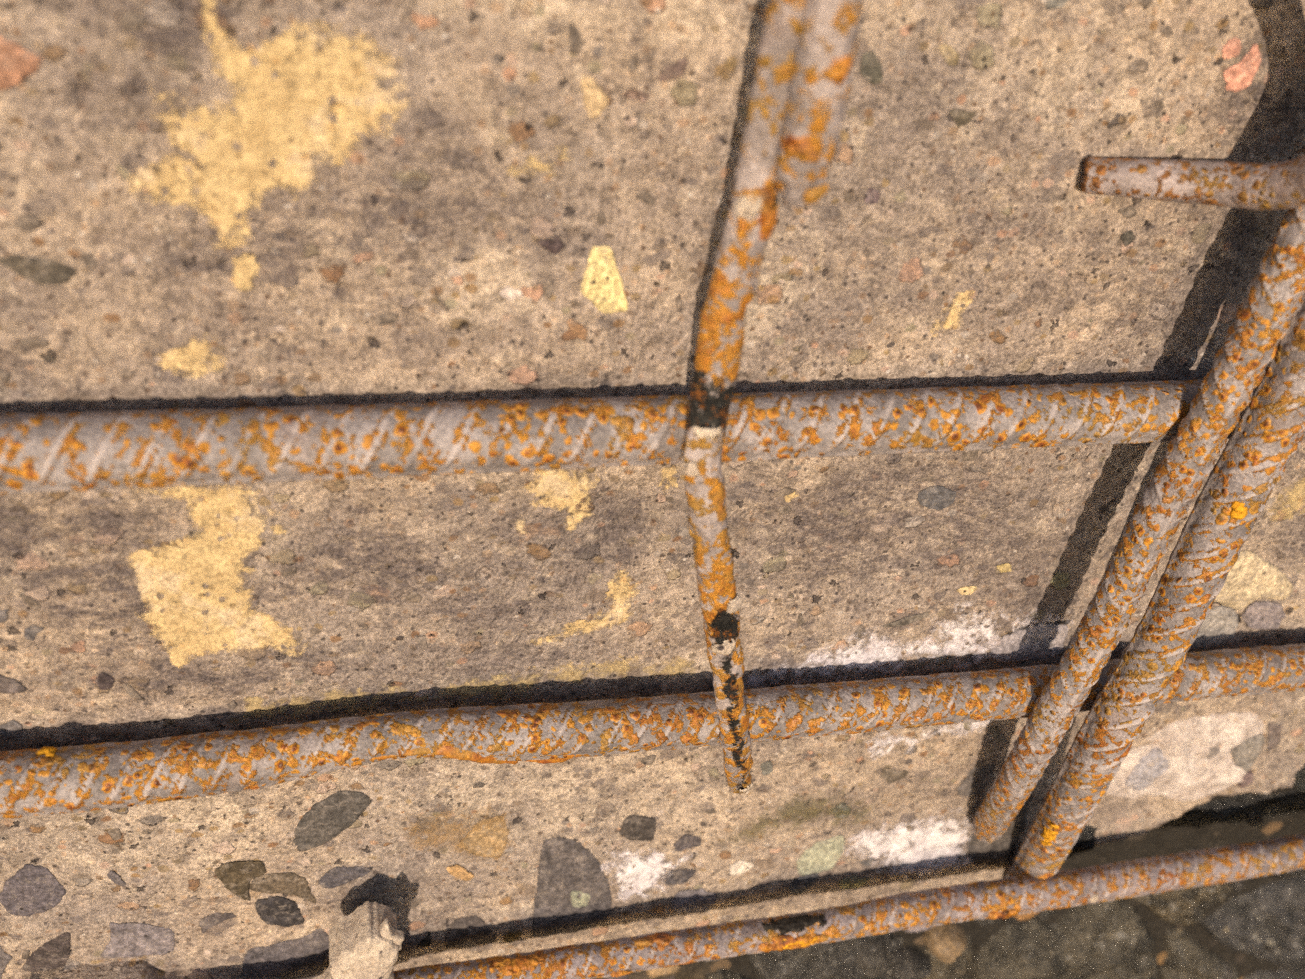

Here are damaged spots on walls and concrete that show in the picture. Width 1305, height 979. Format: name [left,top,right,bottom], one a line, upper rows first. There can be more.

corrosion [826,55,852,87]
peeling [129,0,408,291]
corrosion [780,131,821,163]
corrosion [742,187,778,240]
peeling [524,469,599,531]
peeling [129,484,307,668]
peeling [531,569,640,644]
corrosion [361,745,575,765]
spalling [1059,711,1305,870]
corrosion [633,932,679,946]
corrosion [757,933,828,952]
spalling [593,868,1305,979]